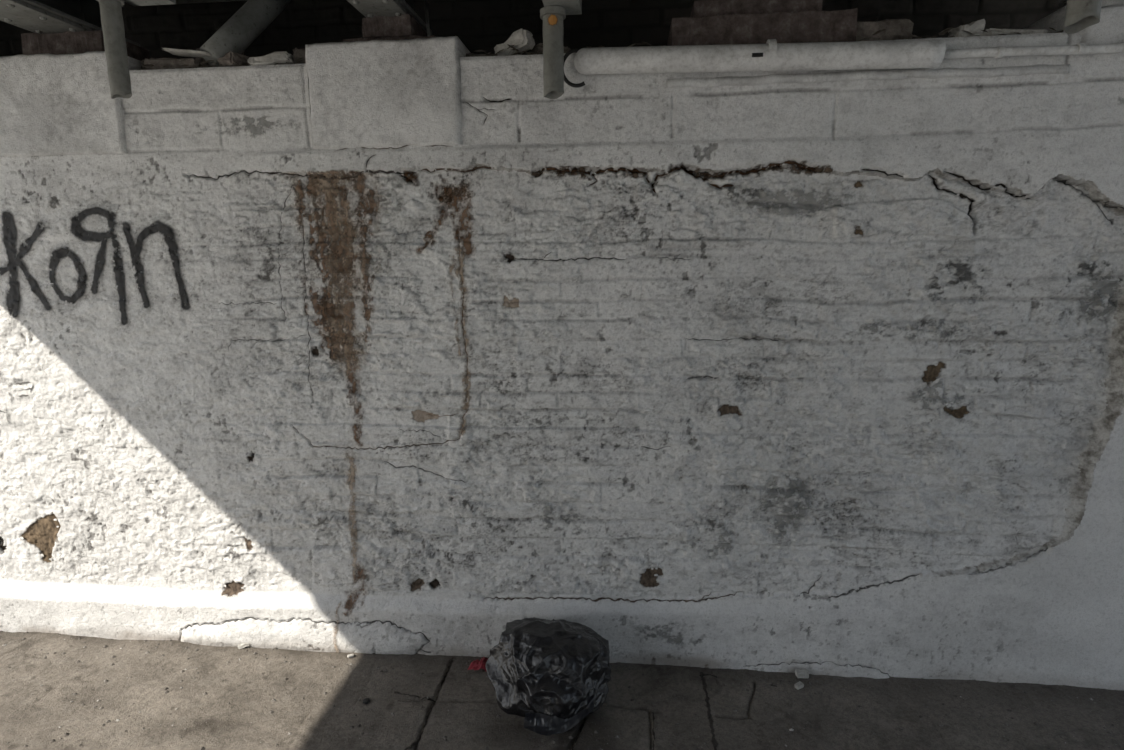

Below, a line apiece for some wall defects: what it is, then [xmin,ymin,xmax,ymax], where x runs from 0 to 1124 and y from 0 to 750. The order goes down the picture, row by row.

corrosion [293,170,378,446]
corrosion [403,169,477,355]
crack [531,160,833,193]
crack [862,169,1030,221]
crack [1055,177,1124,221]
corrosion [460,370,471,435]
spalling [245,163,1124,603]
peeling [222,581,244,597]
corrosion [334,455,365,653]
crack [185,617,453,750]